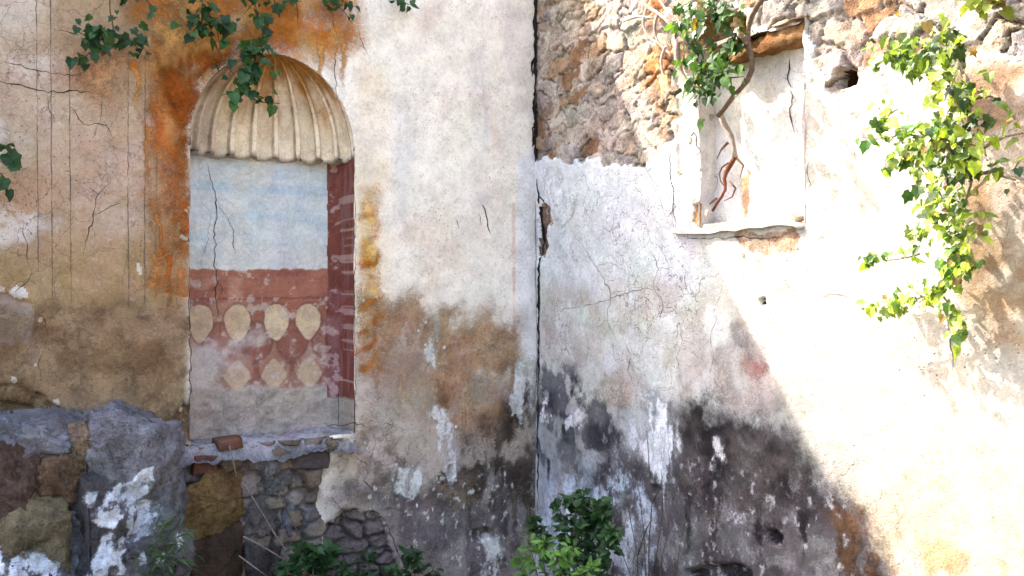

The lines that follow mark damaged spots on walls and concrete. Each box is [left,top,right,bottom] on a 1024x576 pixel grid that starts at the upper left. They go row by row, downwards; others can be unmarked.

spalling [0,392,60,414]
crack [1,61,111,134]
crack [83,178,119,254]
crack [188,168,235,426]
rust [76,0,364,297]
damp [354,294,523,441]
peeling [538,167,577,258]
damp [339,374,894,576]
crack [531,0,716,511]
damp [712,322,764,410]